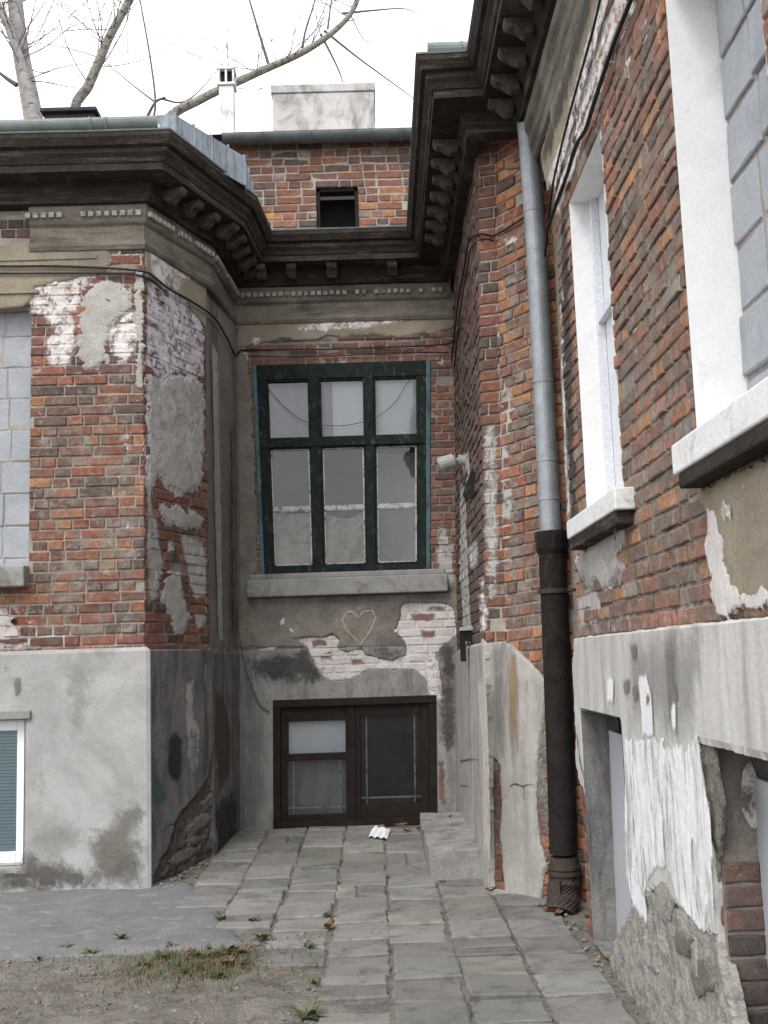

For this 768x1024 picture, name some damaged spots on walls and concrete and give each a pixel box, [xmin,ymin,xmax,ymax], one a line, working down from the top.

peeling [31,275,96,367]
peeling [194,605,207,629]
water stain [249,648,320,683]
flaking render [280,602,456,700]
flaking render [152,693,230,884]
flaking render [607,675,750,1024]